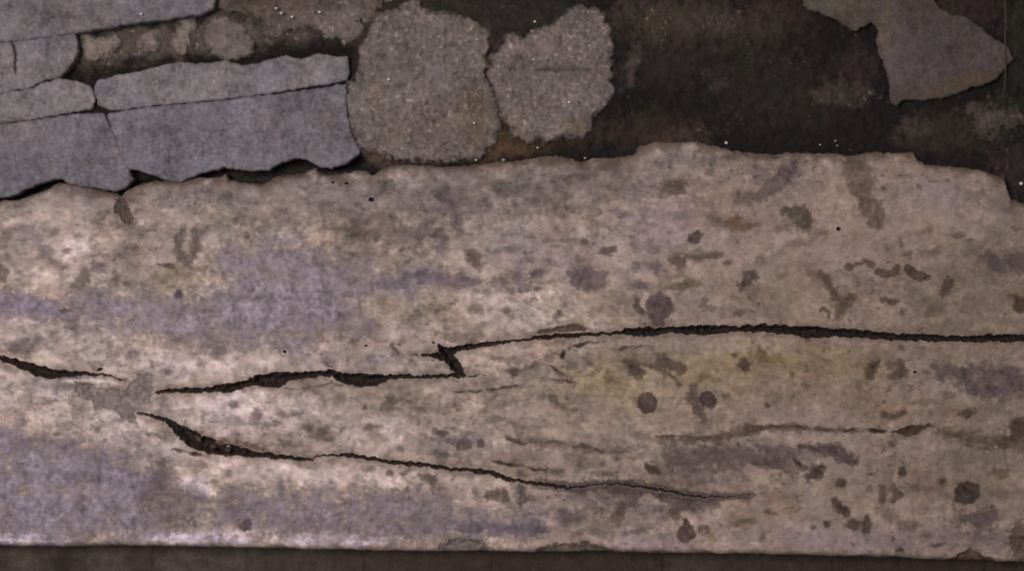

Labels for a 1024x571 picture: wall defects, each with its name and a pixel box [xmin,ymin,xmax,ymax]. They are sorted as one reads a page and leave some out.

crack [0,352,130,384]
crack [134,321,1024,501]